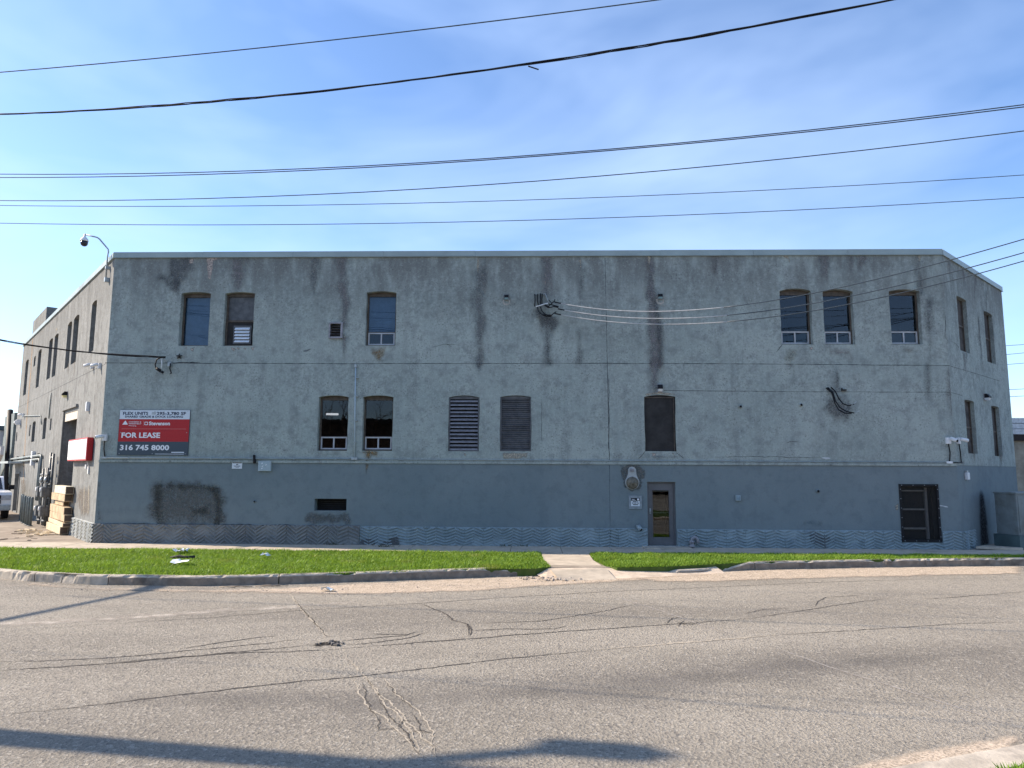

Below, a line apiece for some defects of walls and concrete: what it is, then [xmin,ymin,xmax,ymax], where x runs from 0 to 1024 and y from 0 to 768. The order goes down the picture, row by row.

water stain [160,258,189,292]
water stain [647,258,662,386]